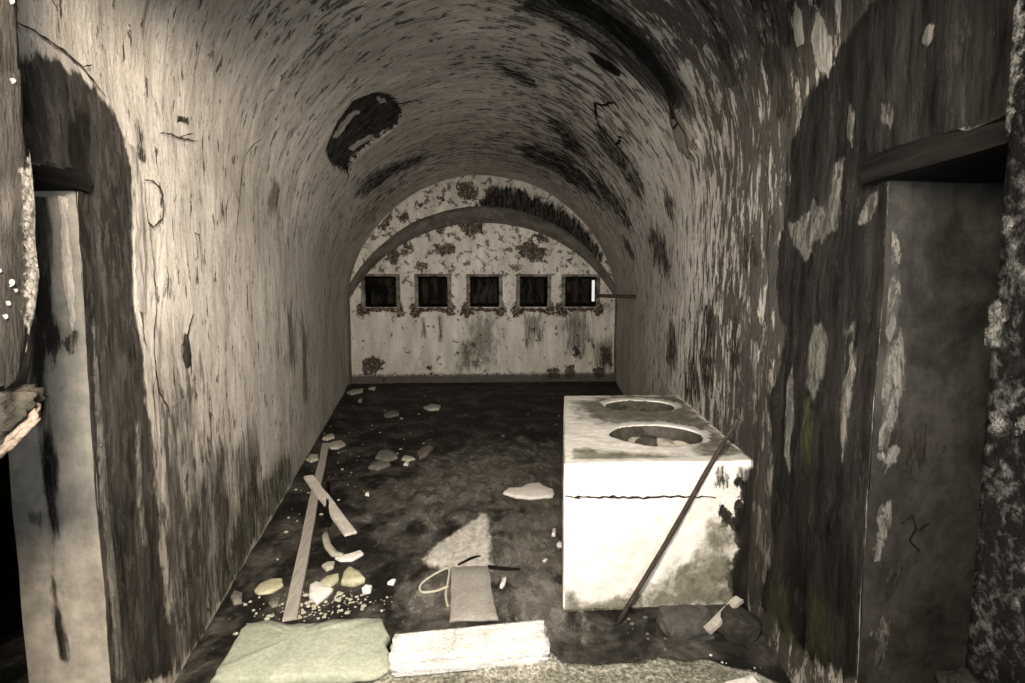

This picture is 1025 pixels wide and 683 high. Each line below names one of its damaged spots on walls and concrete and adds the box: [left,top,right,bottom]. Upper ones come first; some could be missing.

peeling [681,0,743,93]
spalling [326,92,427,199]
leakage [475,184,607,265]
peeling [648,187,675,281]
leakage [460,318,492,370]
leakage [524,313,543,345]
leakage [564,314,612,373]
peeling [666,305,740,409]
peeling [740,0,1025,681]
spalling [715,466,754,605]
leakage [726,343,847,662]
crack [901,514,930,552]